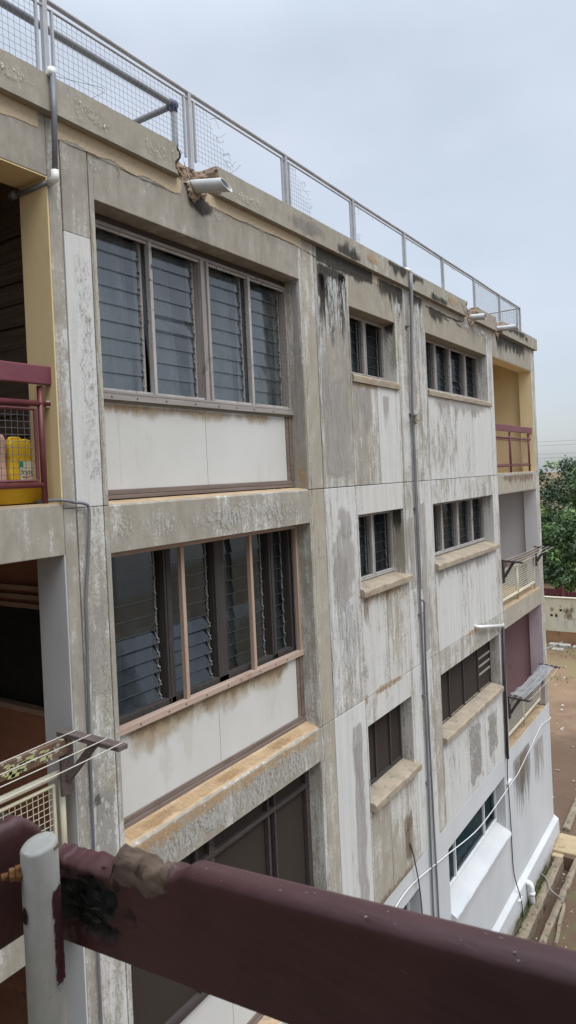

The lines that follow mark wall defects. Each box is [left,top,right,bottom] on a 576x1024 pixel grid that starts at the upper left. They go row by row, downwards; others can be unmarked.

crack [64,142,346,273]
peeling [57,98,349,495]
damp [316,243,448,340]
damp [514,736,544,798]